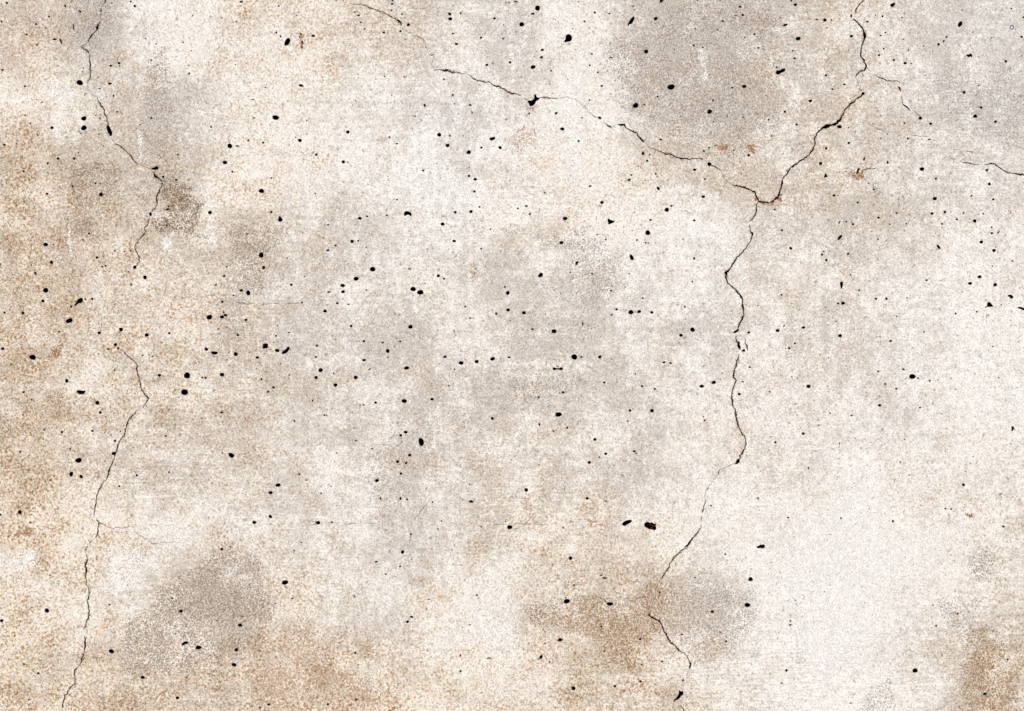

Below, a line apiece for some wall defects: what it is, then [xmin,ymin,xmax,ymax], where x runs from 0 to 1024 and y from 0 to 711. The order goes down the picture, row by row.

crack [82,0,163,279]
crack [950,149,1024,176]
crack [62,349,177,708]
crack [350,0,927,711]